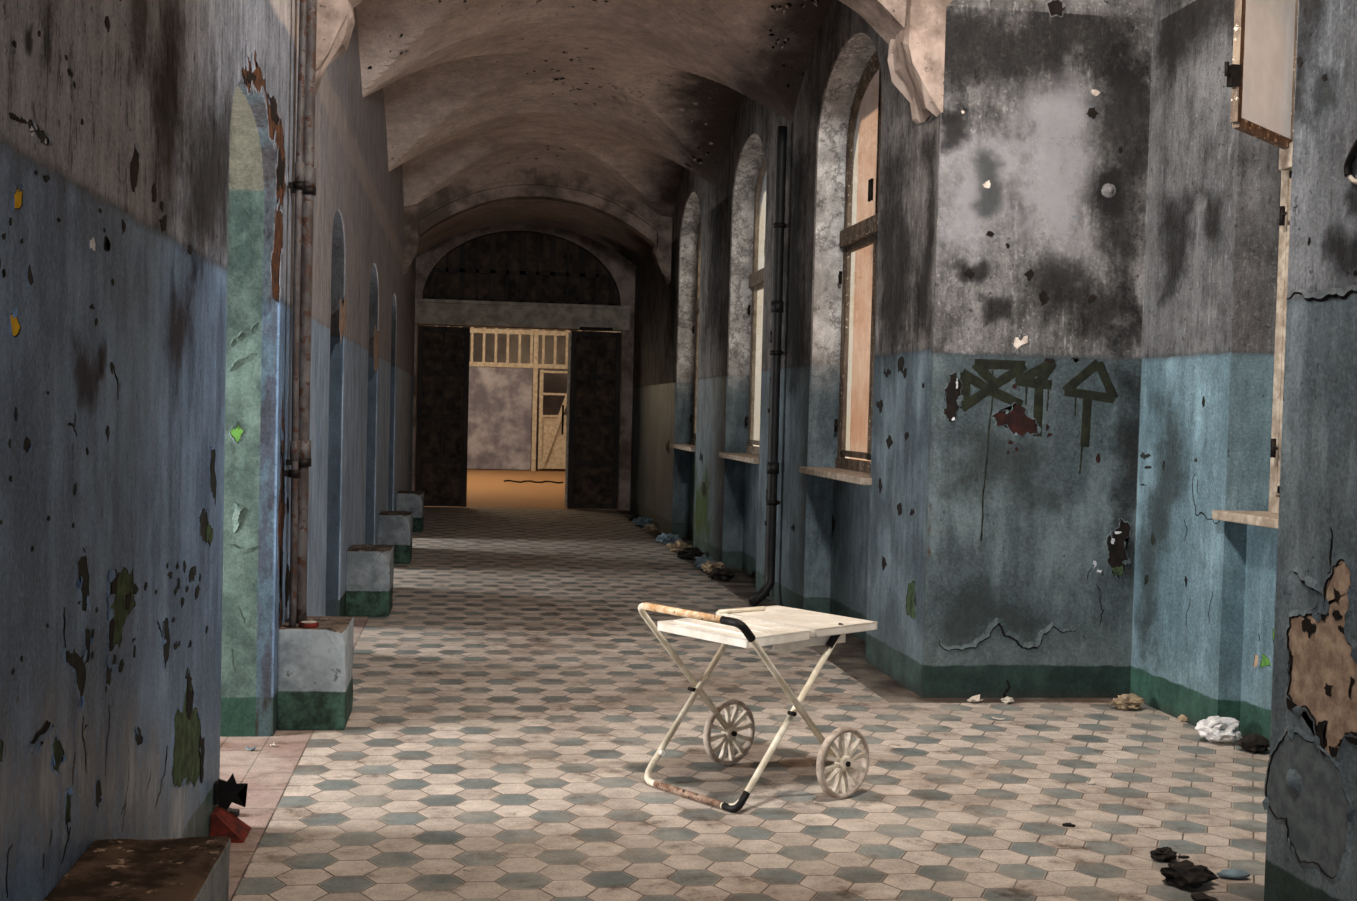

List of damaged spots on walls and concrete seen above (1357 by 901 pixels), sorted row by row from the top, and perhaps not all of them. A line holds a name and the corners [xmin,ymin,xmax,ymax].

damp [975,154,999,215]
damp [957,262,987,281]
damp [984,298,1010,324]
damp [1033,258,1137,333]
flaking render [1093,518,1132,580]
crack [1327,527,1342,575]
peeling [63,551,157,710]
peeling [162,560,202,672]
peeling [0,667,205,839]
flaking render [1252,553,1357,884]